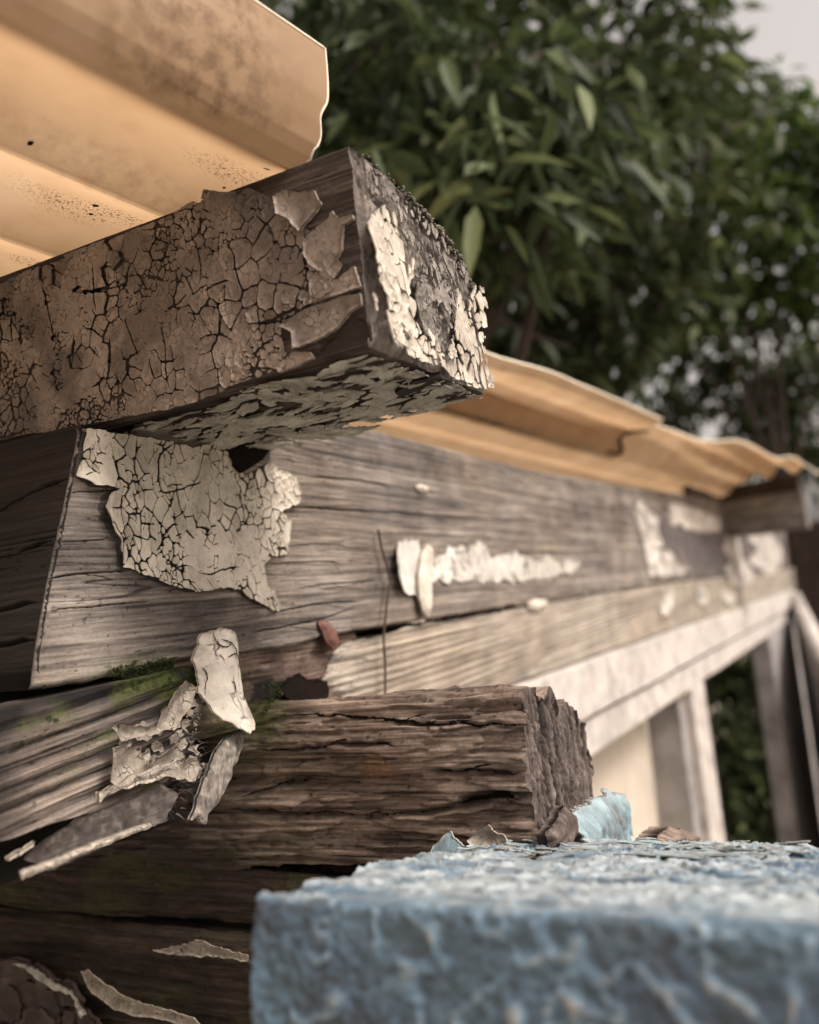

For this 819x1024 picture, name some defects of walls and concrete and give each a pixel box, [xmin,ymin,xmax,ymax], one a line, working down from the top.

crack [0,188,360,437]
peeling [76,153,494,612]
peeling [432,541,581,584]
peeling [524,598,547,612]
peeling [114,692,207,785]
crack [257,713,529,751]
crack [226,764,518,817]